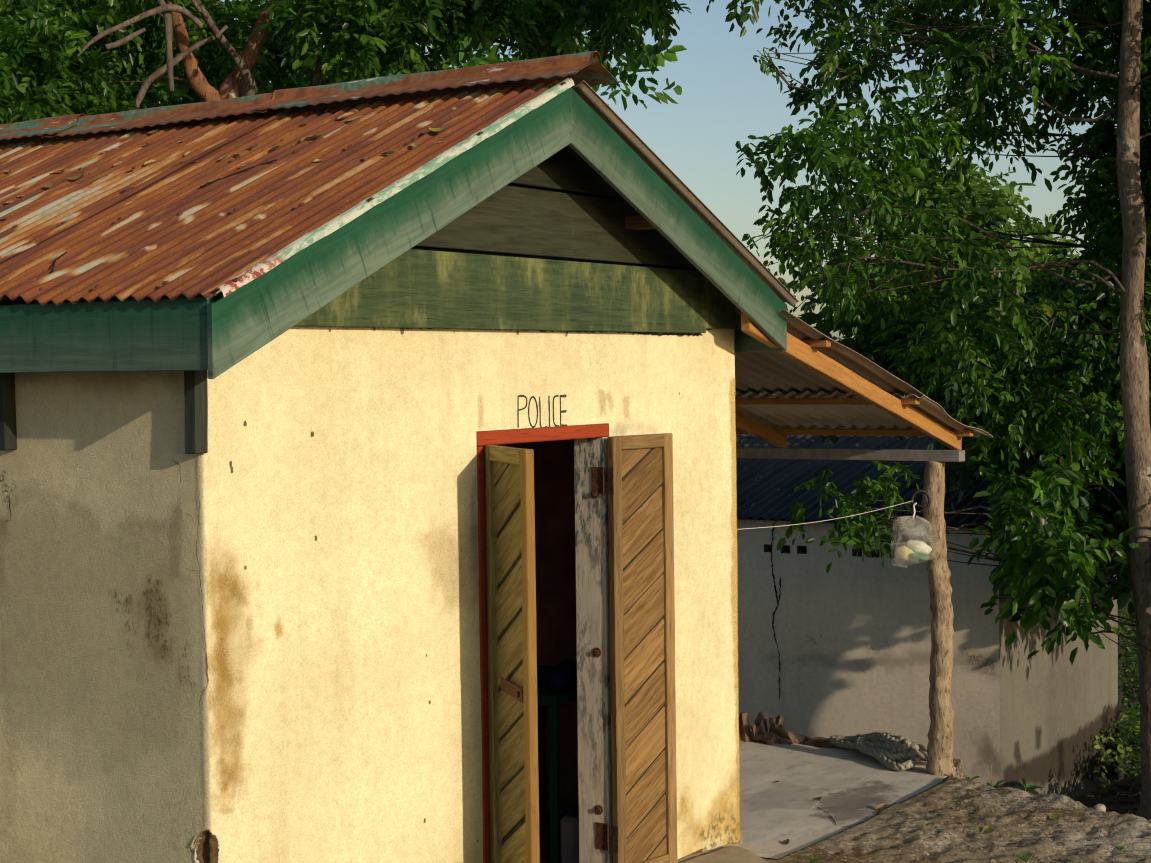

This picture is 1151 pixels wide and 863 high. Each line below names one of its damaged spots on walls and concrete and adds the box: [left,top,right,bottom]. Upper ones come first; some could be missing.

crack [170,458,209,706]
spalling [189,829,220,863]